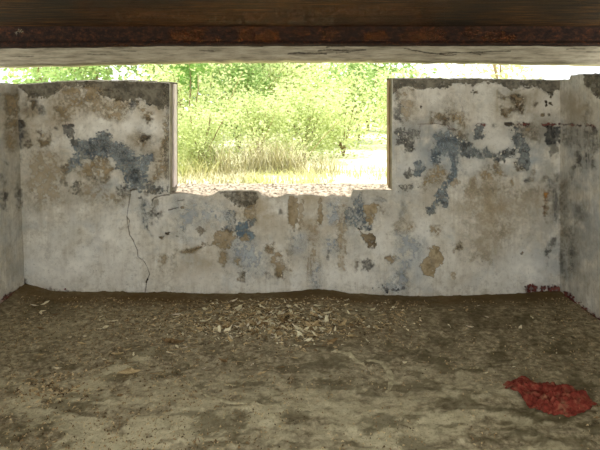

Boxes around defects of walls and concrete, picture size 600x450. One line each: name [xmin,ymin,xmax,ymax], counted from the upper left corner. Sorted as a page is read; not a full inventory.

peeling [60,124,168,199]
peeling [395,127,420,152]
peeling [398,160,426,192]
peeling [425,122,537,215]
crack [127,189,150,292]
flaking render [220,191,259,241]
peeling [343,192,377,249]